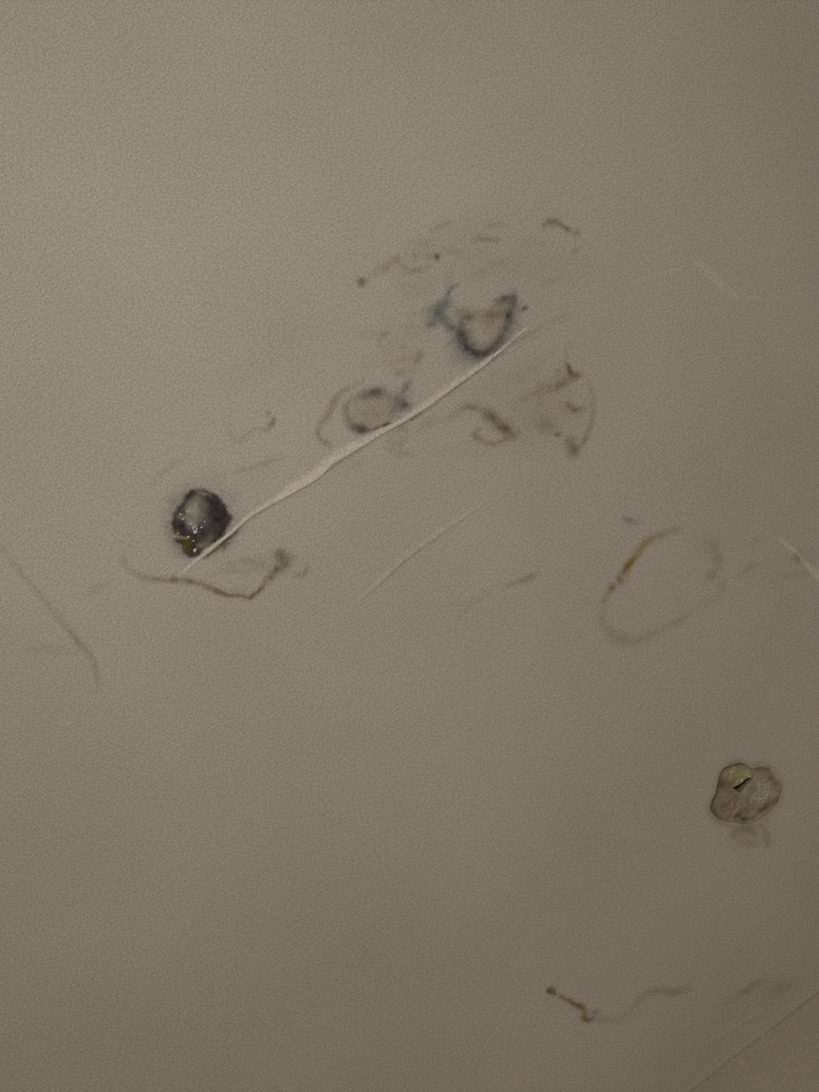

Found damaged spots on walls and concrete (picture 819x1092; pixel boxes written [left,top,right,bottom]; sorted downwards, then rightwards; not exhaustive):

flaking render [710,762,782,824]